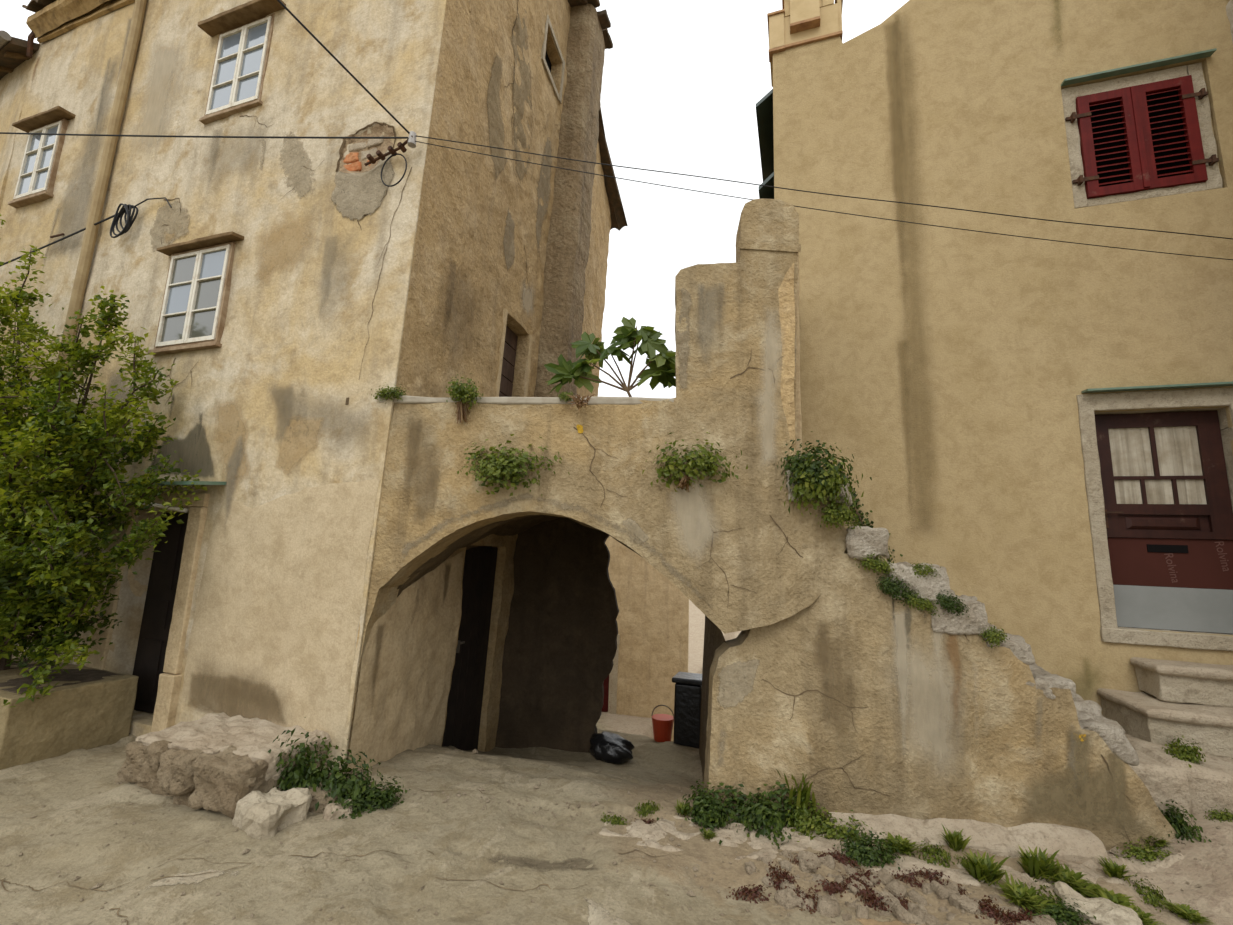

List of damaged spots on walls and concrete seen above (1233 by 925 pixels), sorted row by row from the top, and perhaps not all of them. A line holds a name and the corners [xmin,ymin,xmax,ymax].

flaking render [280,134,314,198]
flaking render [331,122,397,220]
crack [762,679,889,796]